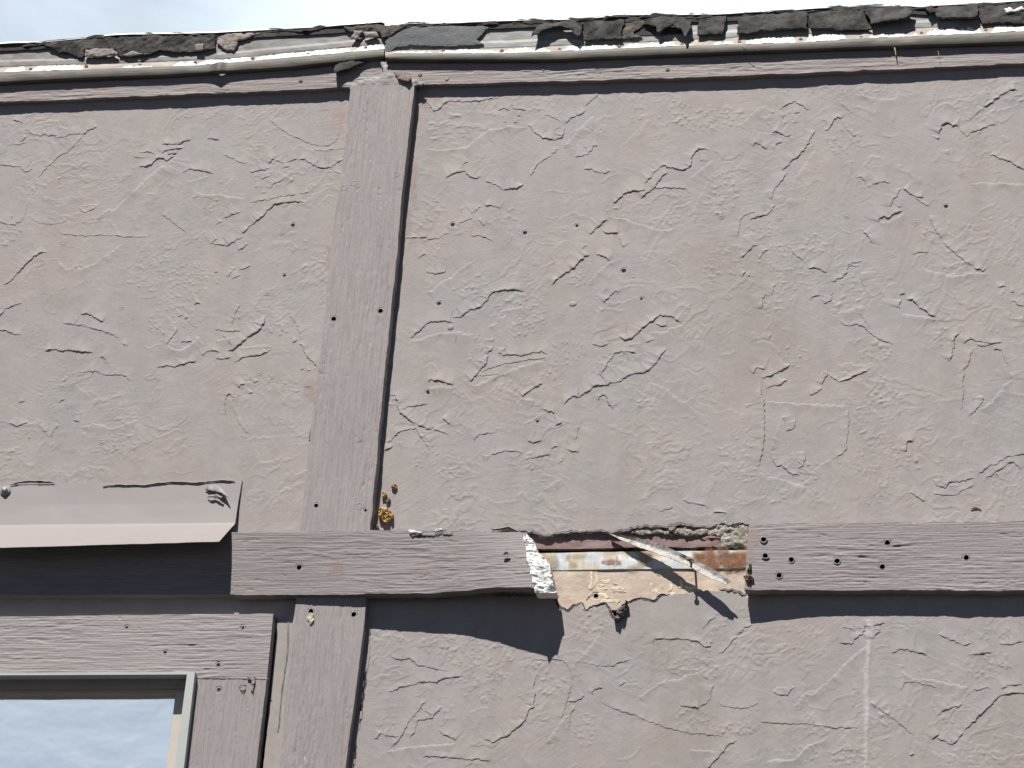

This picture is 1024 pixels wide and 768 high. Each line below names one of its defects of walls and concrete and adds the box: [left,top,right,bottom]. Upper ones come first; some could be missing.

crack [926,81,1024,169]
crack [134,117,345,251]
crack [381,88,711,461]
crack [725,111,1024,502]
spalling [523,522,750,558]
corrosion [693,546,746,570]
spalling [550,593,669,623]